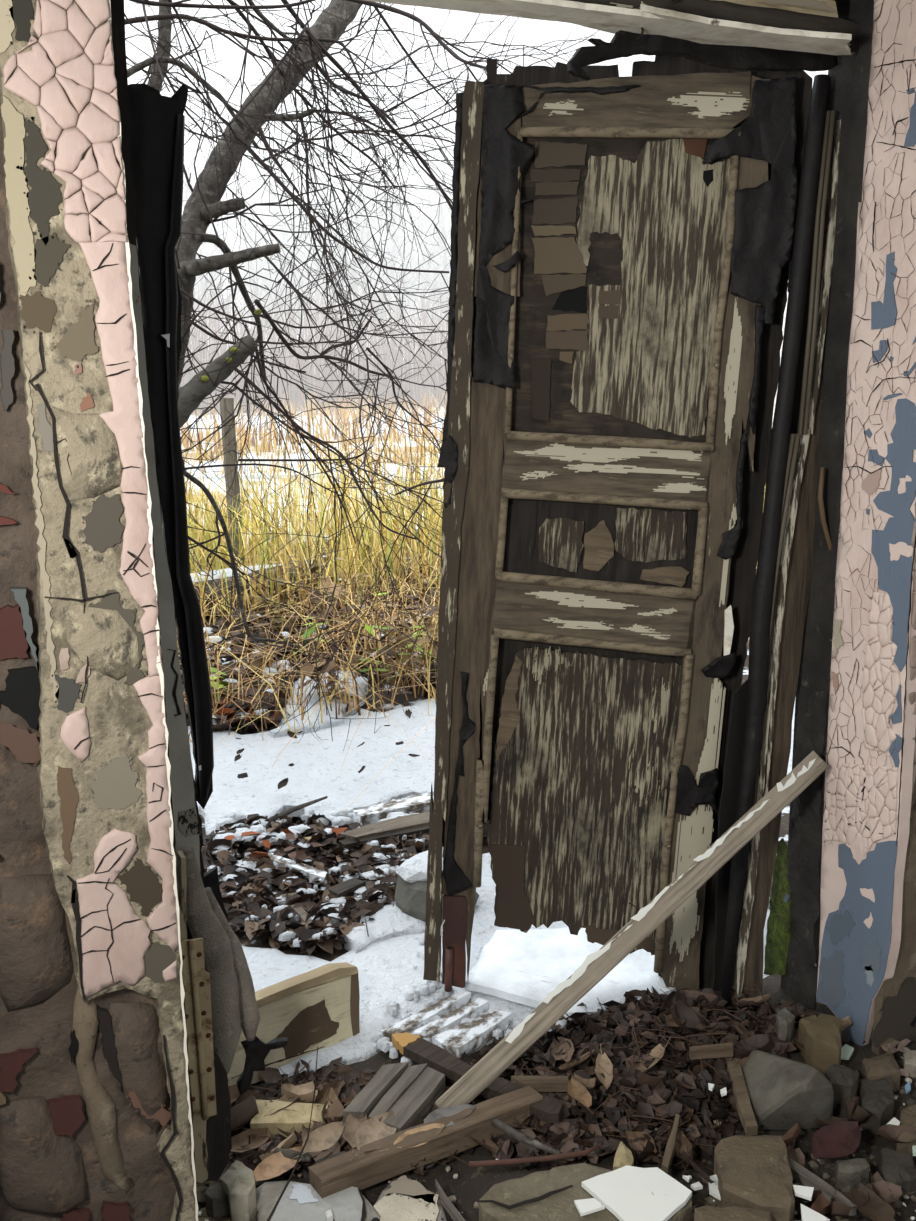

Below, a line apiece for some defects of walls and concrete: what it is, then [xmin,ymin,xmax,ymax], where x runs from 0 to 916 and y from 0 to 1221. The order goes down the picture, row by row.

peeling [0,0,179,1094]
crack [89,221,118,271]
crack [29,332,181,716]
crack [821,0,916,845]
peeling [871,252,897,363]
peeling [904,88,916,147]
peeling [816,393,916,1060]
crack [67,743,176,1001]
crack [68,1029,79,1064]